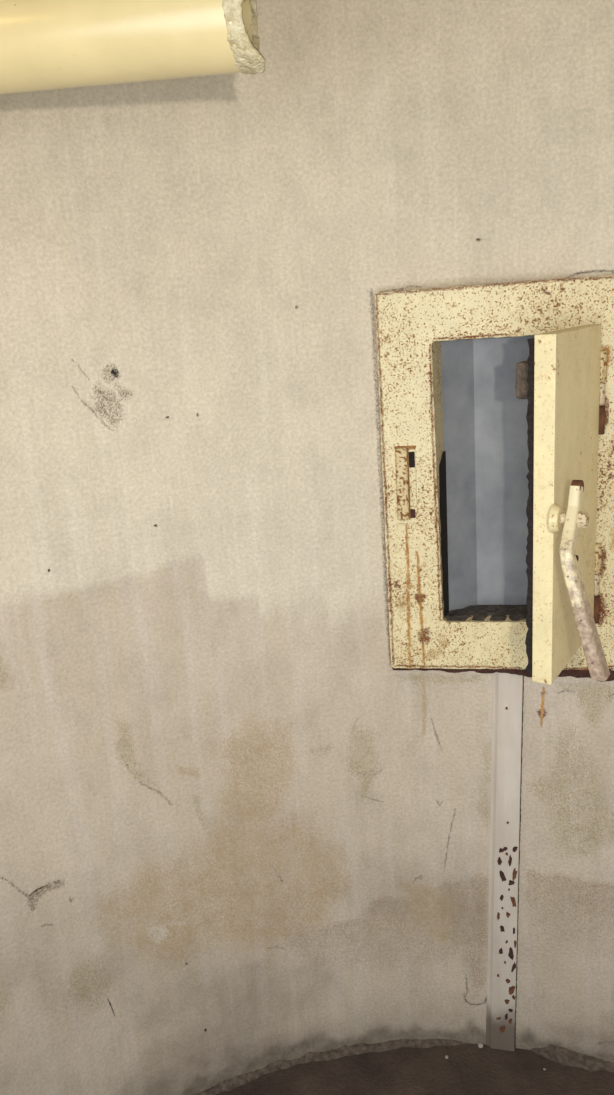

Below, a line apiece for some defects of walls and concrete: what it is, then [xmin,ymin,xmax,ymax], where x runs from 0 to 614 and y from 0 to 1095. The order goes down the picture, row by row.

crack [0,877,75,927]